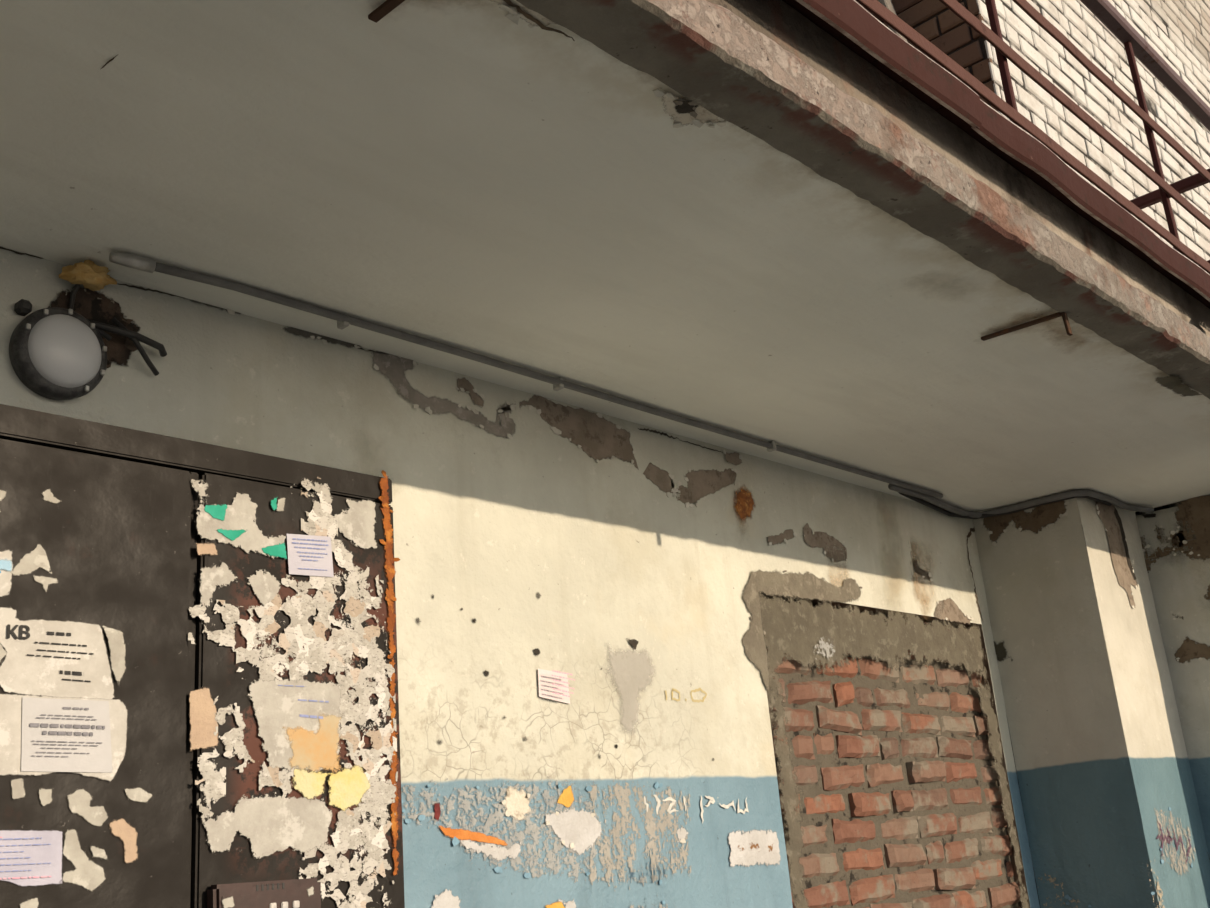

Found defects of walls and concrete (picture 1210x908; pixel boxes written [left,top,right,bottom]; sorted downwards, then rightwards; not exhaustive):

flaking render [283,327,743,508]
rust [734,487,755,521]
flaking render [766,523,848,562]
flaking render [912,560,933,581]
flaking render [980,501,1070,546]
flaking render [1095,495,1210,609]
flaking render [934,598,974,624]
flaking render [1175,637,1210,663]
peeling [401,776,692,908]